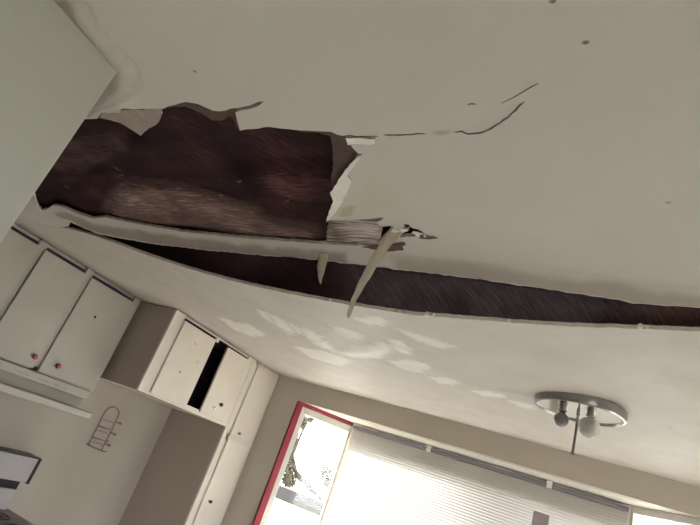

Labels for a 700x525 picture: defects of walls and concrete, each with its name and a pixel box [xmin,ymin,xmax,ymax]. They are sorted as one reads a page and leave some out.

spalling [99,109,163,136]
crack [345,83,538,137]